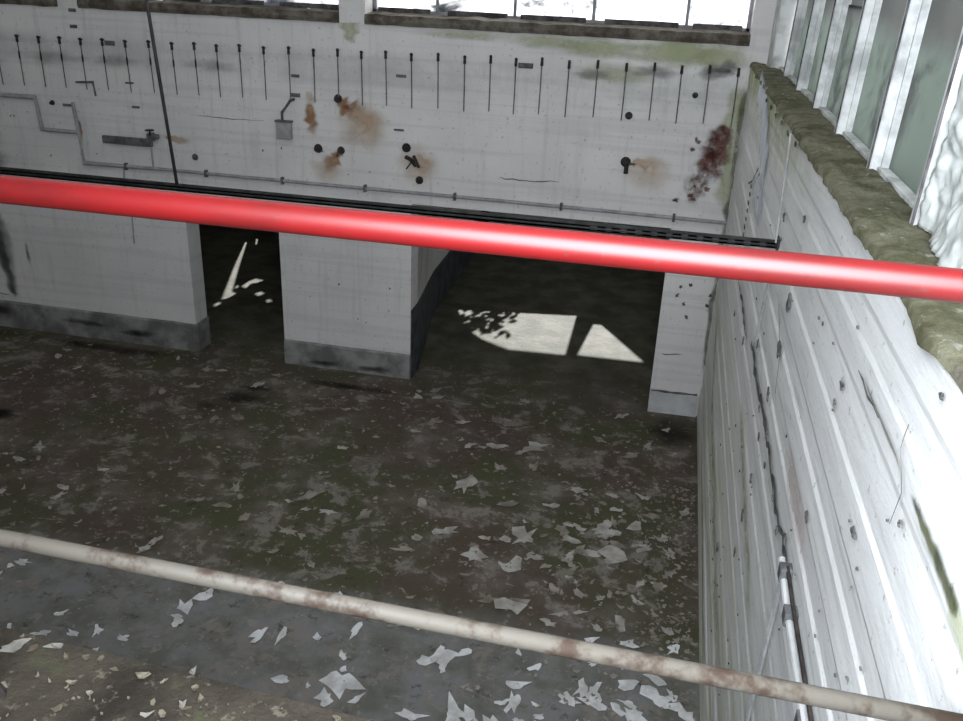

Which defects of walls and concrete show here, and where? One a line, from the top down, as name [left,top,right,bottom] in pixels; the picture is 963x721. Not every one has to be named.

rust [305,94,317,129]
rust [338,98,370,121]
rust [327,152,342,166]
rust [672,125,731,202]
water stain [0,226,16,294]